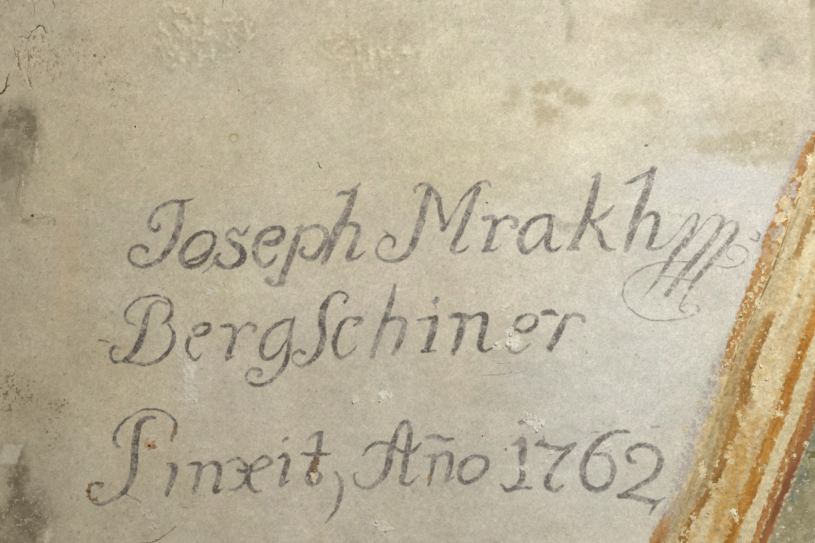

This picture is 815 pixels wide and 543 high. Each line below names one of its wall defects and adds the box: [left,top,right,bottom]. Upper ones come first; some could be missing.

crack [0,0,63,95]
water stain [0,16,150,251]
peeling [749,350,784,424]